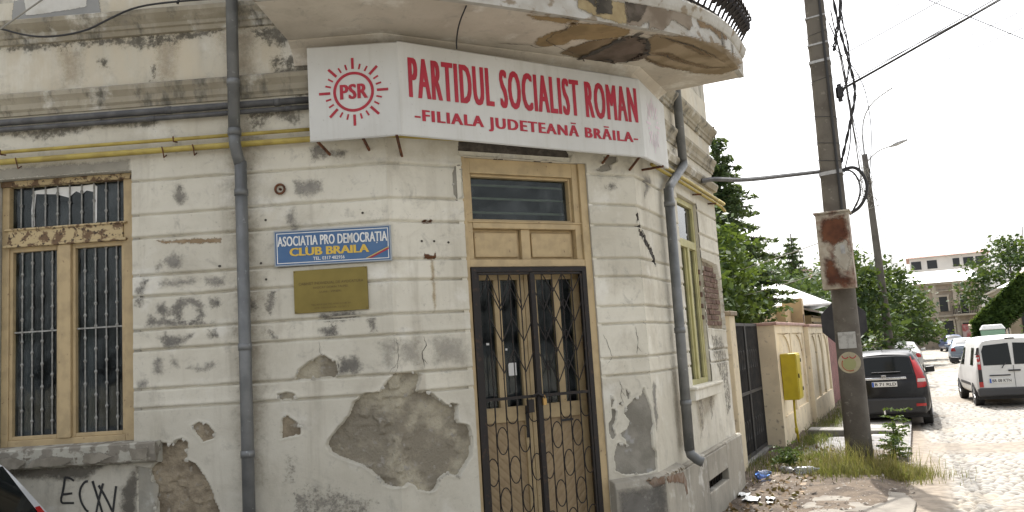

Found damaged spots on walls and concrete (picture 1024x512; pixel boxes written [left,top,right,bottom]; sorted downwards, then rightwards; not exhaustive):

flaking render [576,0,734,64]
crack [636,213,656,267]
flaking render [296,353,359,380]
peeling [0,452,112,470]
flaking render [129,422,220,512]
flaking render [282,416,303,438]
flaking render [329,371,470,491]
flaking render [609,383,688,494]